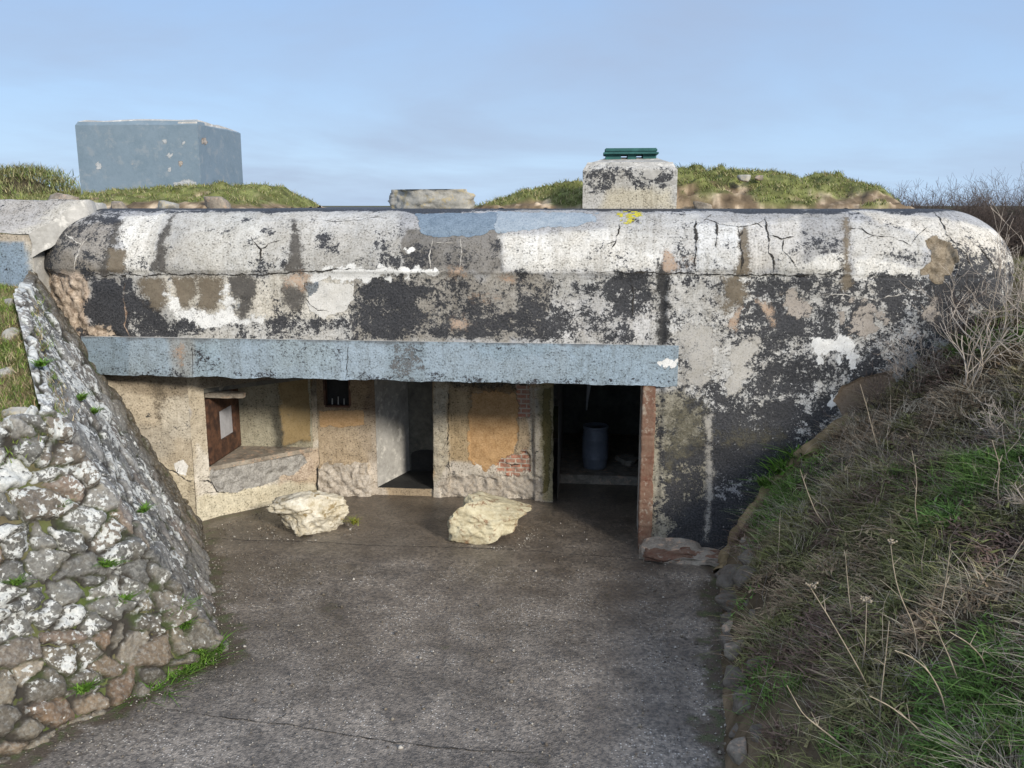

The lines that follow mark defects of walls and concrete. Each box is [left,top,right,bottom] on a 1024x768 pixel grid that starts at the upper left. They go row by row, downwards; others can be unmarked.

crack [54,233,393,336]
damp [655,262,673,345]
damp [717,227,751,315]
crack [597,214,905,315]
crack [850,213,997,271]
spalling [920,235,960,284]
spalling [810,297,896,416]
peeling [438,384,544,502]
damp [663,399,786,540]